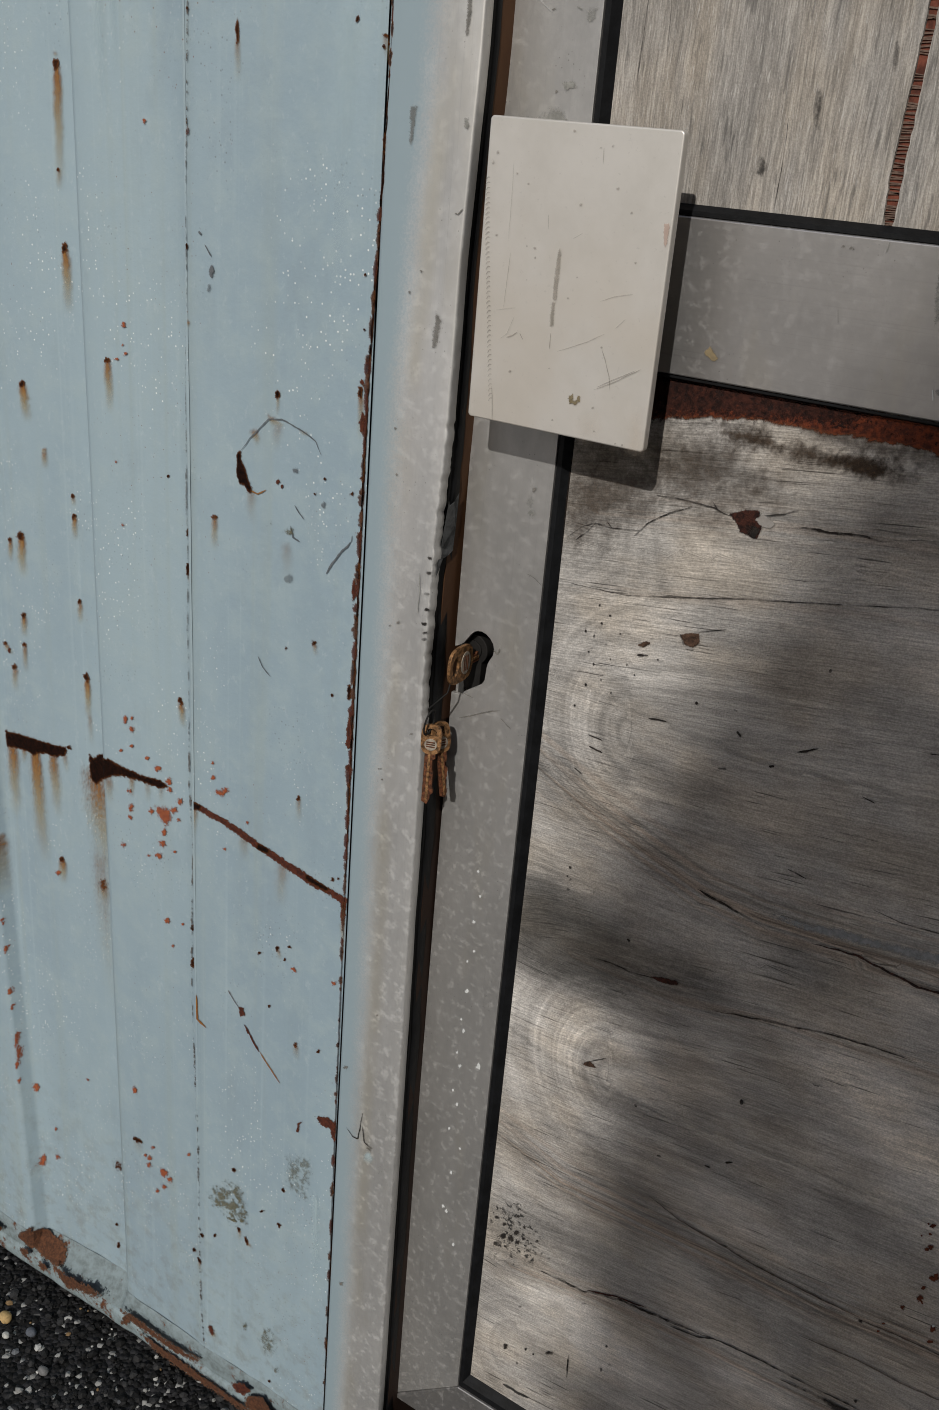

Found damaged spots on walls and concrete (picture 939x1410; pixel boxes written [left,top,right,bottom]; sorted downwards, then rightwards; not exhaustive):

corrosion [52,58,61,126]
crack [885,0,939,226]
corrosion [61,242,69,284]
corrosion [19,379,27,406]
corrosion [651,372,939,457]
corrosion [8,531,25,558]
corrosion [3,612,26,673]
corrosion [188,0,394,1404]
corrosion [5,729,71,811]
corrosion [88,754,167,831]
corrosion [18,1227,103,1299]
corrosion [119,1197,270,1410]